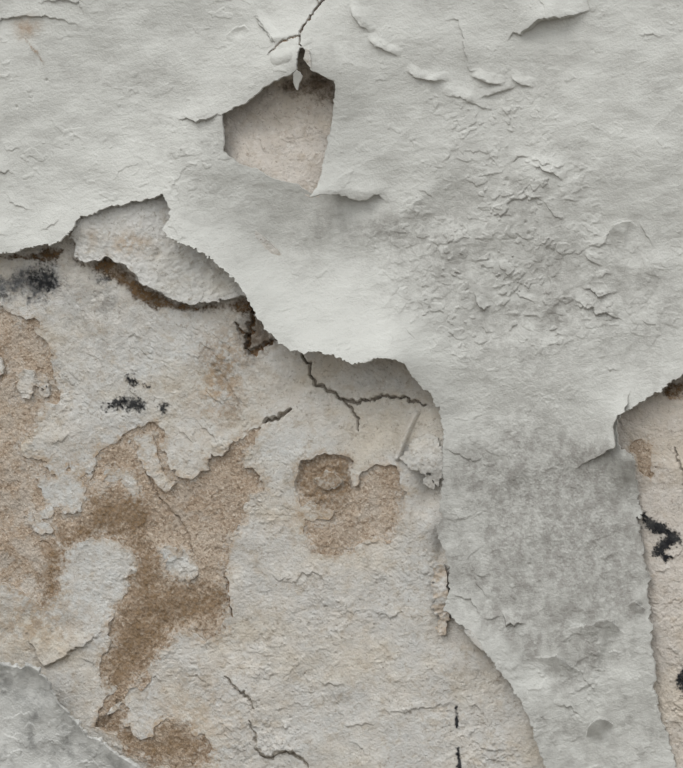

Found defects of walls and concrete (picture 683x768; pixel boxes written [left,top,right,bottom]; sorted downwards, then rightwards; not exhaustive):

crack [256,0,324,56]
peeling [162,30,413,217]
leakage [0,248,63,301]
crack [265,410,291,424]
peeling [0,148,631,768]
crack [302,355,423,432]
peeling [550,345,683,768]
crack [225,677,309,768]